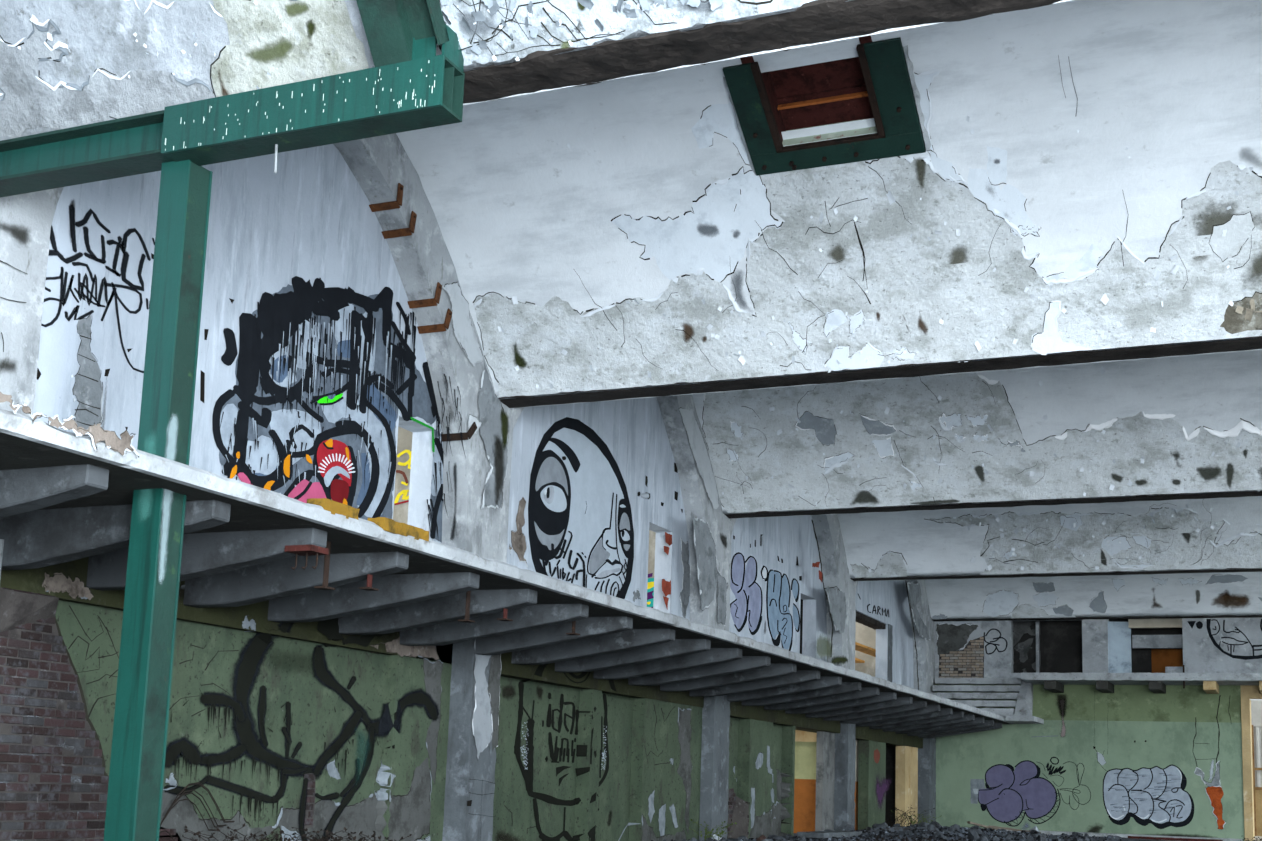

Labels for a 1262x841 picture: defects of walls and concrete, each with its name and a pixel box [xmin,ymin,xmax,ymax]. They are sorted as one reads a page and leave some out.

spalling [71,314,110,437]
peeling [442,69,1262,690]
flaking render [0,572,109,841]
crack [68,605,119,721]
crack [169,645,239,716]
peeling [472,640,501,759]